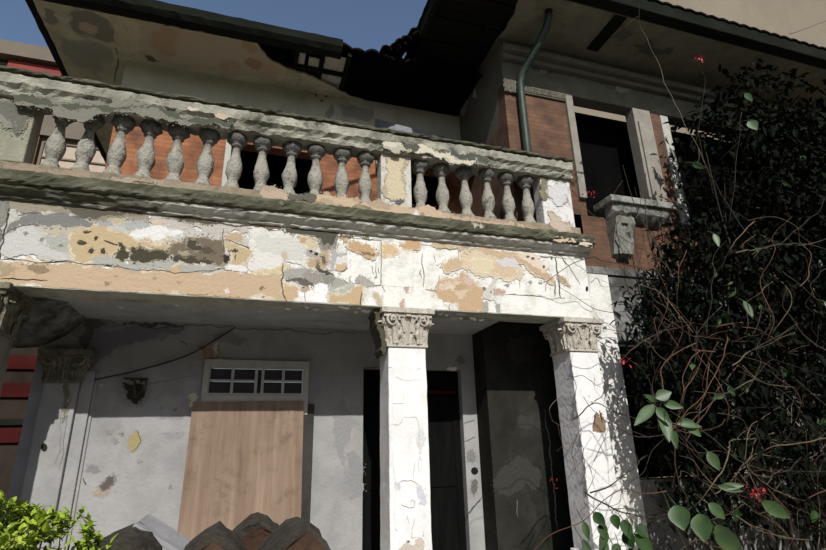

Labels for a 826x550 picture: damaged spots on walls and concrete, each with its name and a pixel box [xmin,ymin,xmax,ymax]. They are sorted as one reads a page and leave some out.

peeling [138,22,282,79]
peeling [0,209,383,313]
peeling [341,237,420,259]
peeling [429,242,569,321]
crack [540,255,589,298]
crack [88,323,367,356]
spalling [592,412,608,436]
crack [388,367,421,539]
peeling [398,532,430,550]